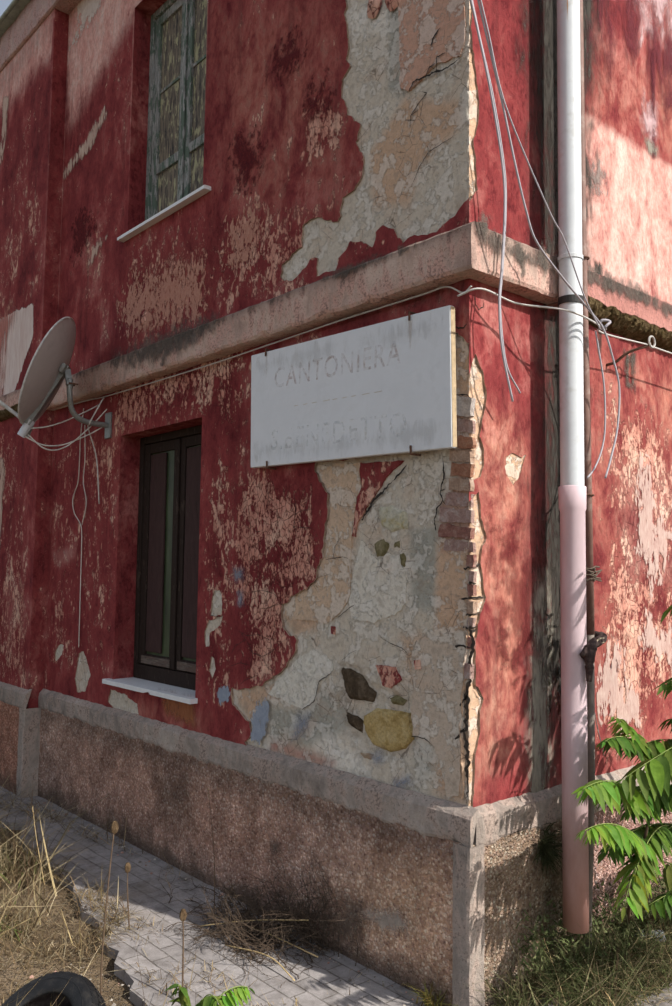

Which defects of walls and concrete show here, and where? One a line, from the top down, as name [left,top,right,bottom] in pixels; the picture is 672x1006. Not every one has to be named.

peeling [115,249,210,346]
peeling [220,197,270,268]
flaking render [280,0,479,281]
water stain [521,0,558,257]
water stain [585,141,608,218]
water stain [583,0,672,157]
water stain [587,260,672,317]
flaking render [231,333,487,807]
peeling [634,453,672,671]
crack [412,563,484,803]
peeling [596,639,641,736]